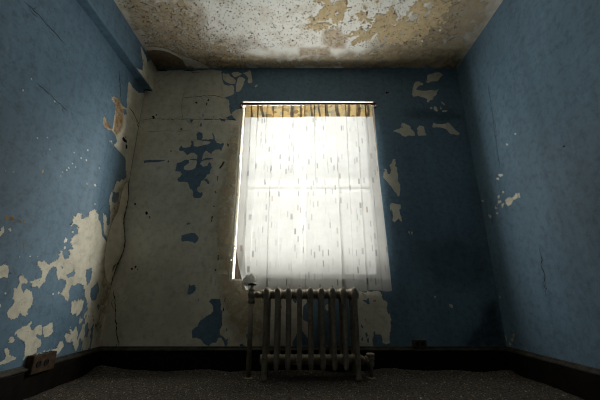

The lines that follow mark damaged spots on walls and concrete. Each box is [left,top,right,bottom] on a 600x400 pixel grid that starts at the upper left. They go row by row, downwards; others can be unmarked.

crack [111,183,129,347]
peeling [0,0,465,366]
peeling [488,191,520,218]